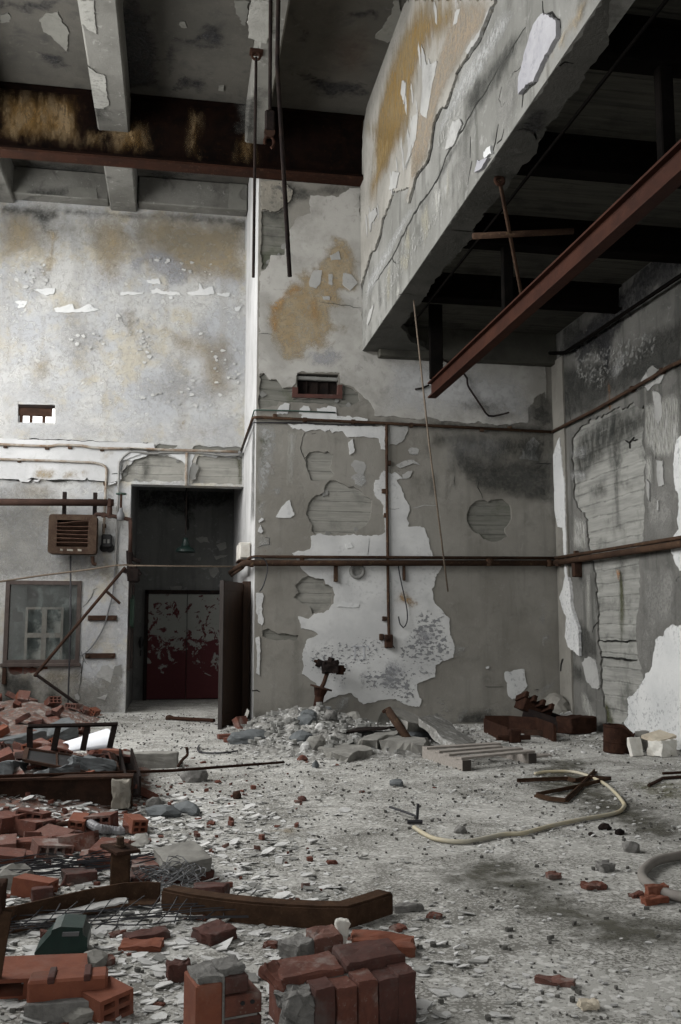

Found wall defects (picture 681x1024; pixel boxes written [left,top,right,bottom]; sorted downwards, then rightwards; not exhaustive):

corrosion [5,97,74,138]
peeling [39,12,69,52]
peeling [78,0,97,35]
peeling [88,66,109,109]
crack [322,0,561,308]
water stain [372,4,513,190]
peeling [518,13,561,95]
peeling [54,304,99,313]
water stain [270,238,355,364]
peeling [255,0,546,707]
peeling [0,438,242,486]
spalling [553,365,681,750]